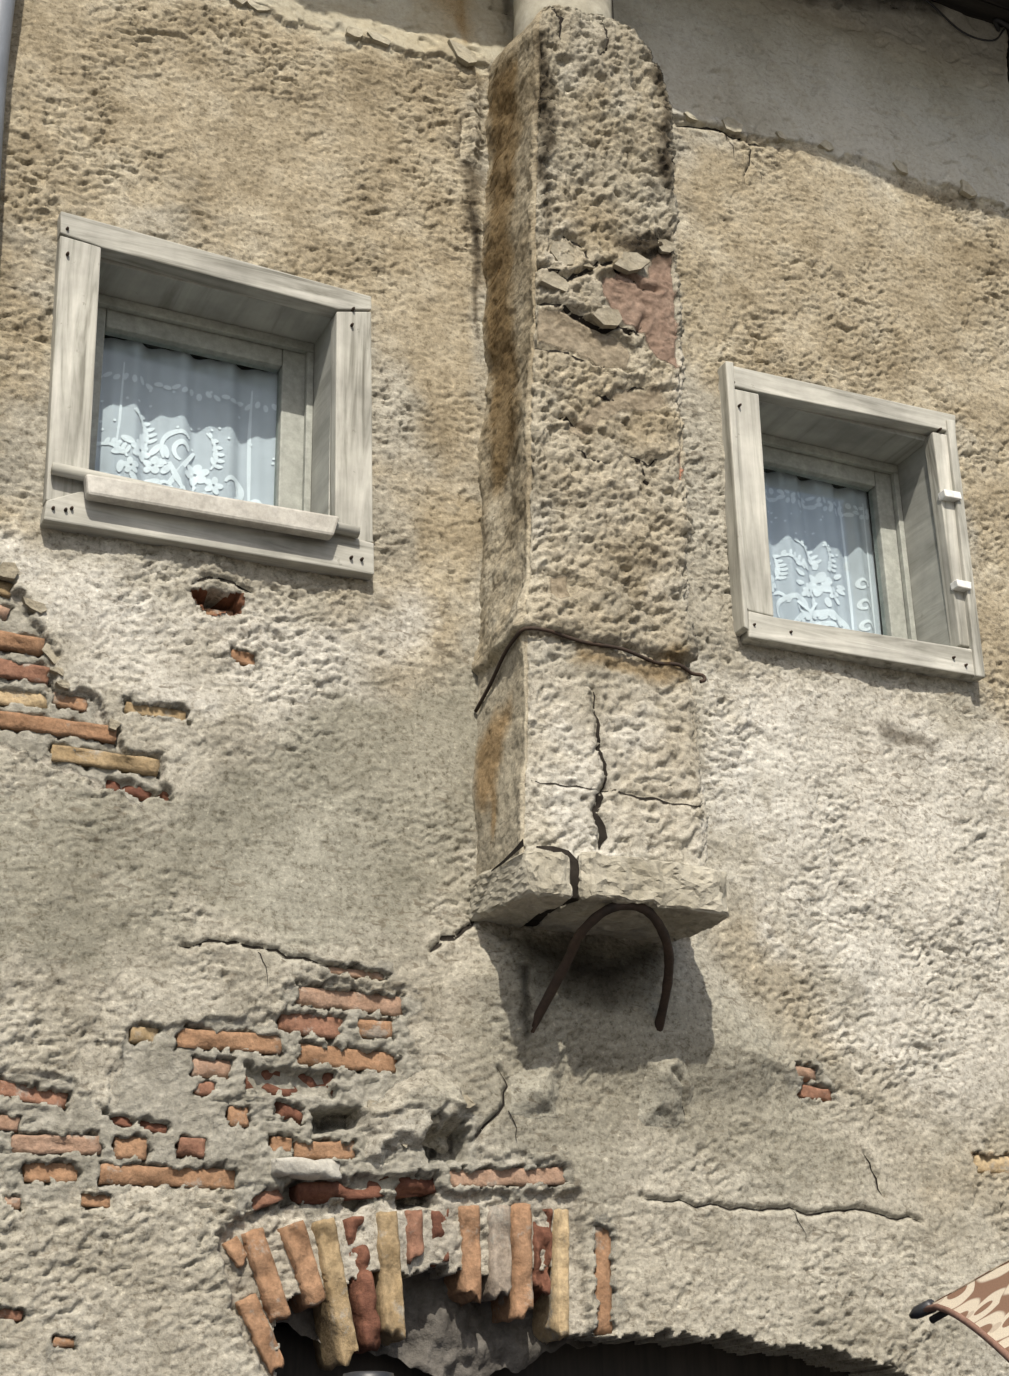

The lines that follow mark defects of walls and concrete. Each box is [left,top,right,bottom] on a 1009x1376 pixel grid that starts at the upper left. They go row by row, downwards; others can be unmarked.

crack [551,7,564,40]
flaking render [537,239,679,368]
spalling [191,587,245,616]
flaking render [0,562,194,805]
flaking render [230,645,264,667]
crack [491,692,703,926]
crack [179,939,318,984]
crack [430,922,474,952]
flaking render [0,960,574,1218]
crack [471,1068,517,1142]
crack [644,1155,919,1232]
flaking render [583,1214,625,1338]